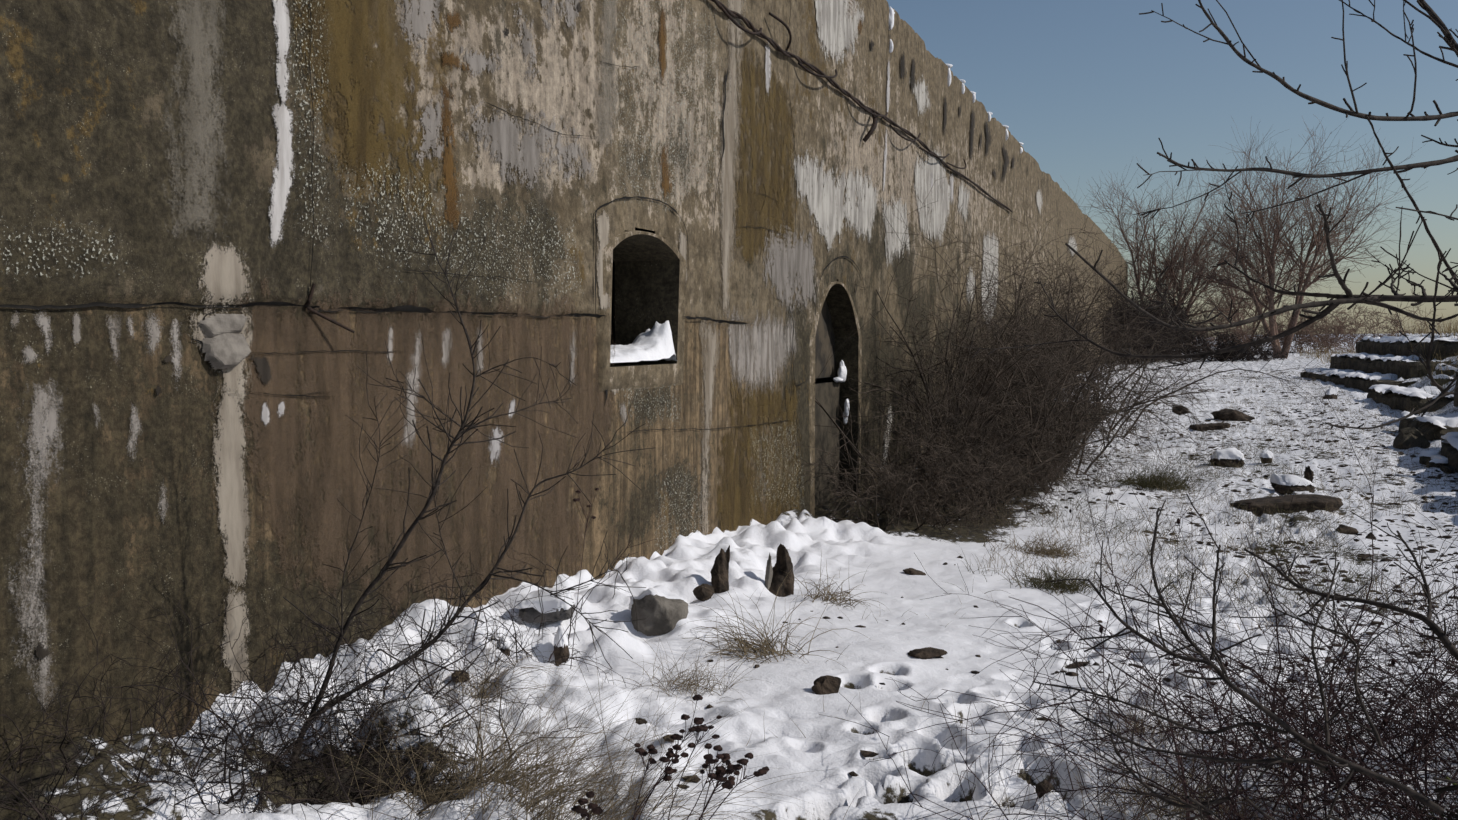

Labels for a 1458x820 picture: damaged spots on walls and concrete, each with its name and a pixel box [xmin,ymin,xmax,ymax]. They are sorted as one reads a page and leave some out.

water stain [269,0,448,246]
crack [0,0,797,397]
peeling [394,0,443,54]
peeling [411,84,594,188]
peeling [461,0,591,87]
peeling [815,0,875,65]
peeling [793,51,1015,267]
efflorescence [10,385,63,705]
flaking render [183,242,272,696]
water stain [234,279,627,616]